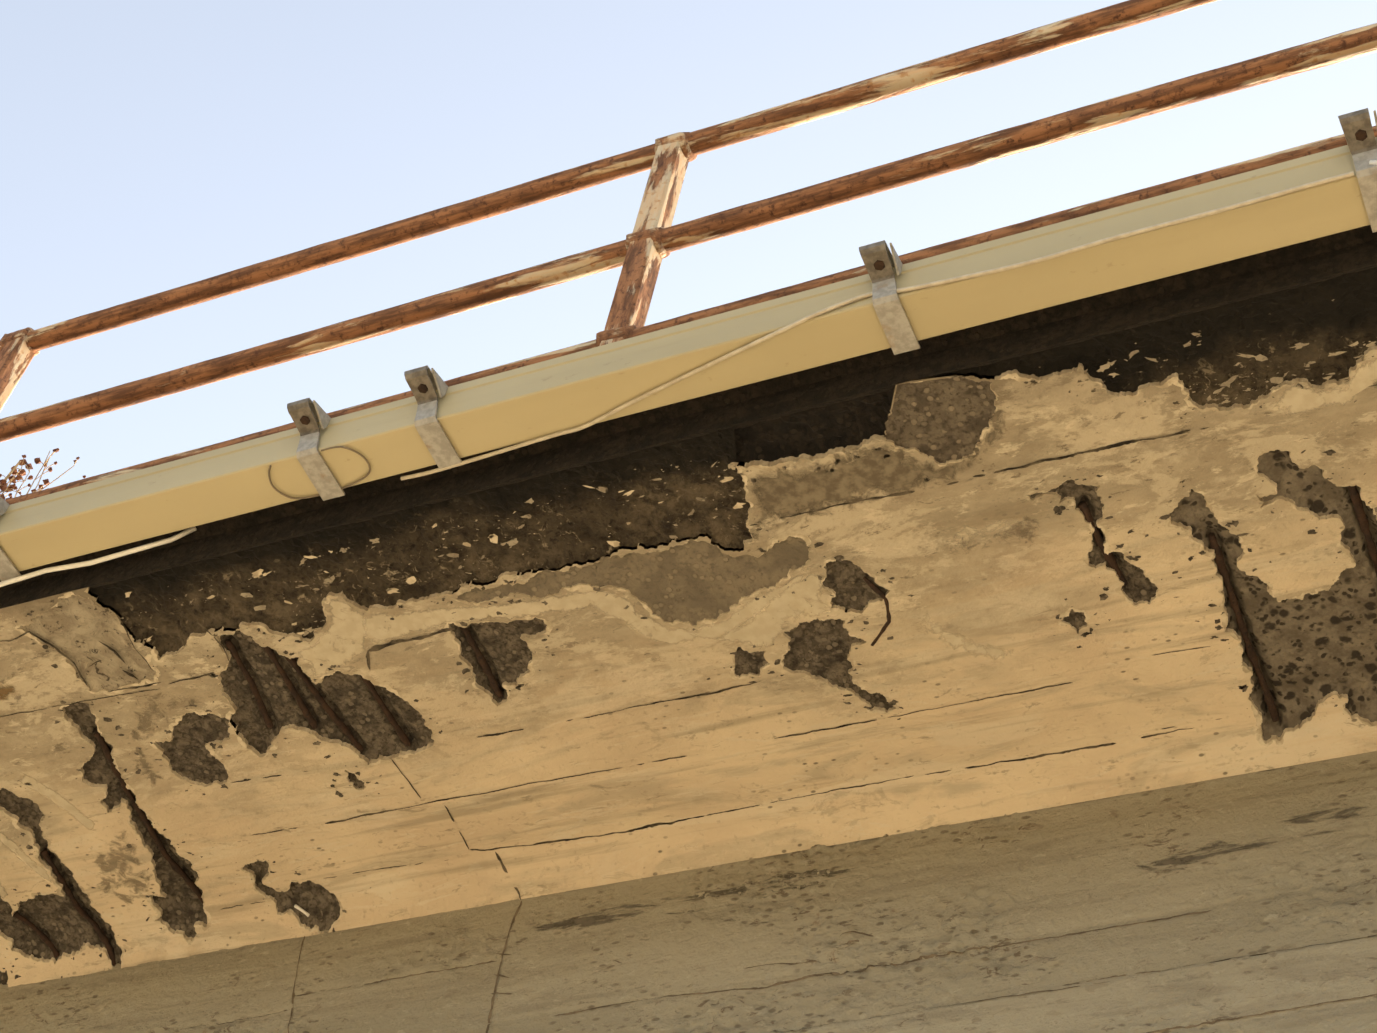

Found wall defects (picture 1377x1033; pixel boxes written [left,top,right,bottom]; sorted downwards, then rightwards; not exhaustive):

crack [567,681,760,721]
spalling [15,267,1377,945]
spalling [0,780,132,985]
crack [150,718,1222,1033]
crack [779,935,1377,1033]